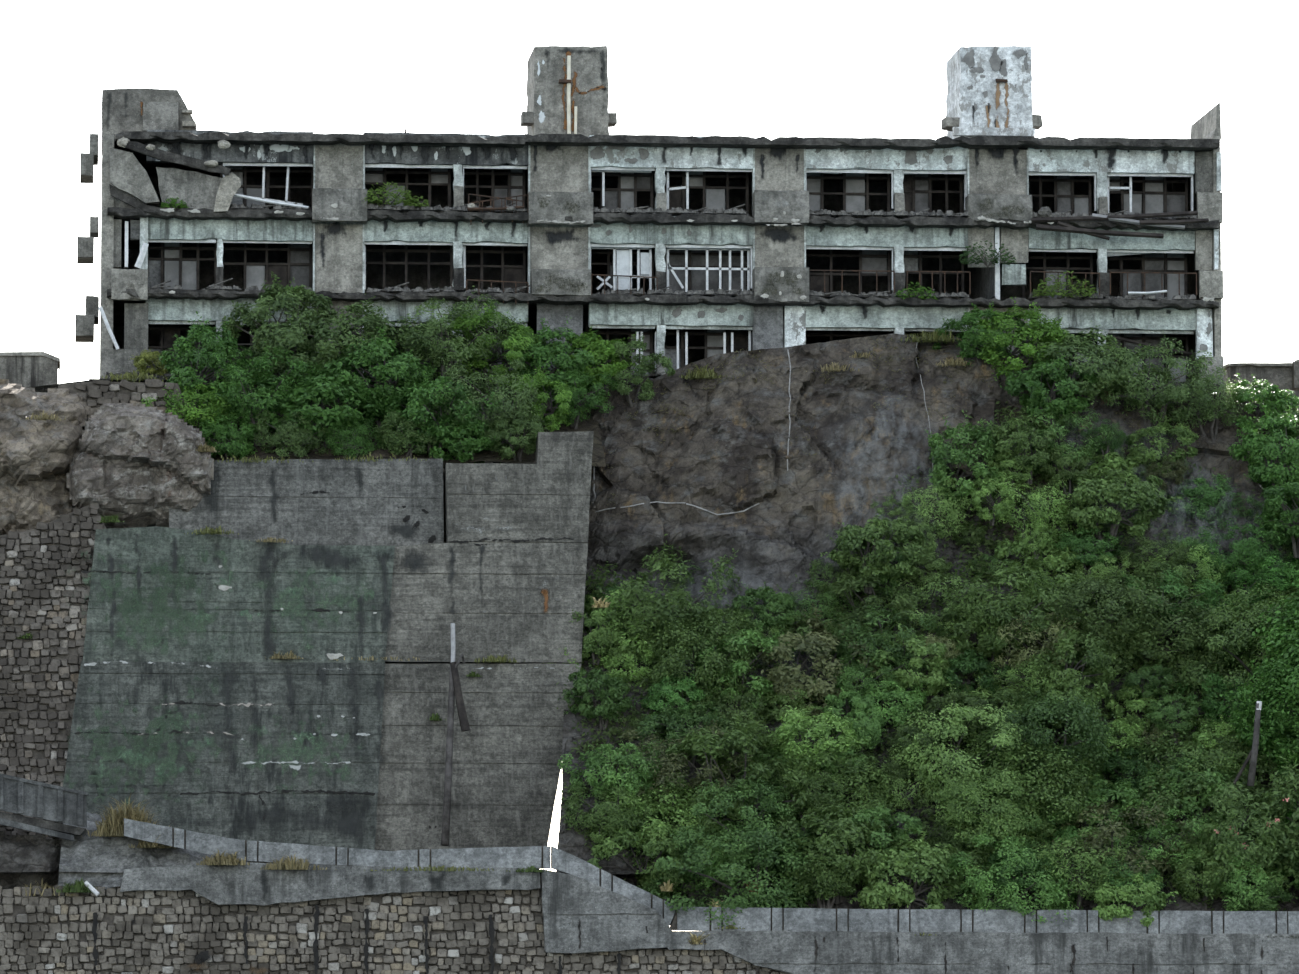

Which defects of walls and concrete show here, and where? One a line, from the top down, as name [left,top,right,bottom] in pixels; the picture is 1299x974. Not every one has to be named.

rust [562,51,605,131]
peeling [961,45,1028,111]
rust [985,83,1009,128]
peeling [239,144,300,158]
damp [207,469,220,517]
damp [269,470,278,521]
damp [303,546,358,568]
damp [392,525,425,570]
damp [260,543,287,654]
damp [378,554,392,632]
damp [341,597,380,736]
damp [209,667,351,781]